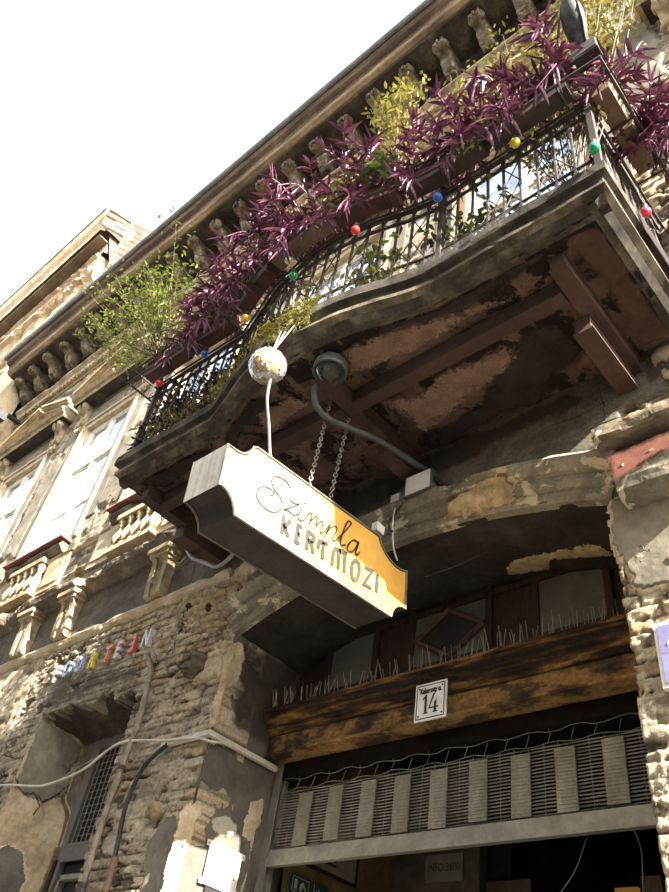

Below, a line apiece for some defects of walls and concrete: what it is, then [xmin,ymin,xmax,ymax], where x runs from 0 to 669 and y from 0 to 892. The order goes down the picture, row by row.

spalling [651,344,669,380]
peeling [607,435,669,479]
flaking render [446,473,516,519]
flaking render [506,496,669,597]
flaking render [242,799,264,841]
spalling [0,844,29,892]
flaking render [139,802,202,892]